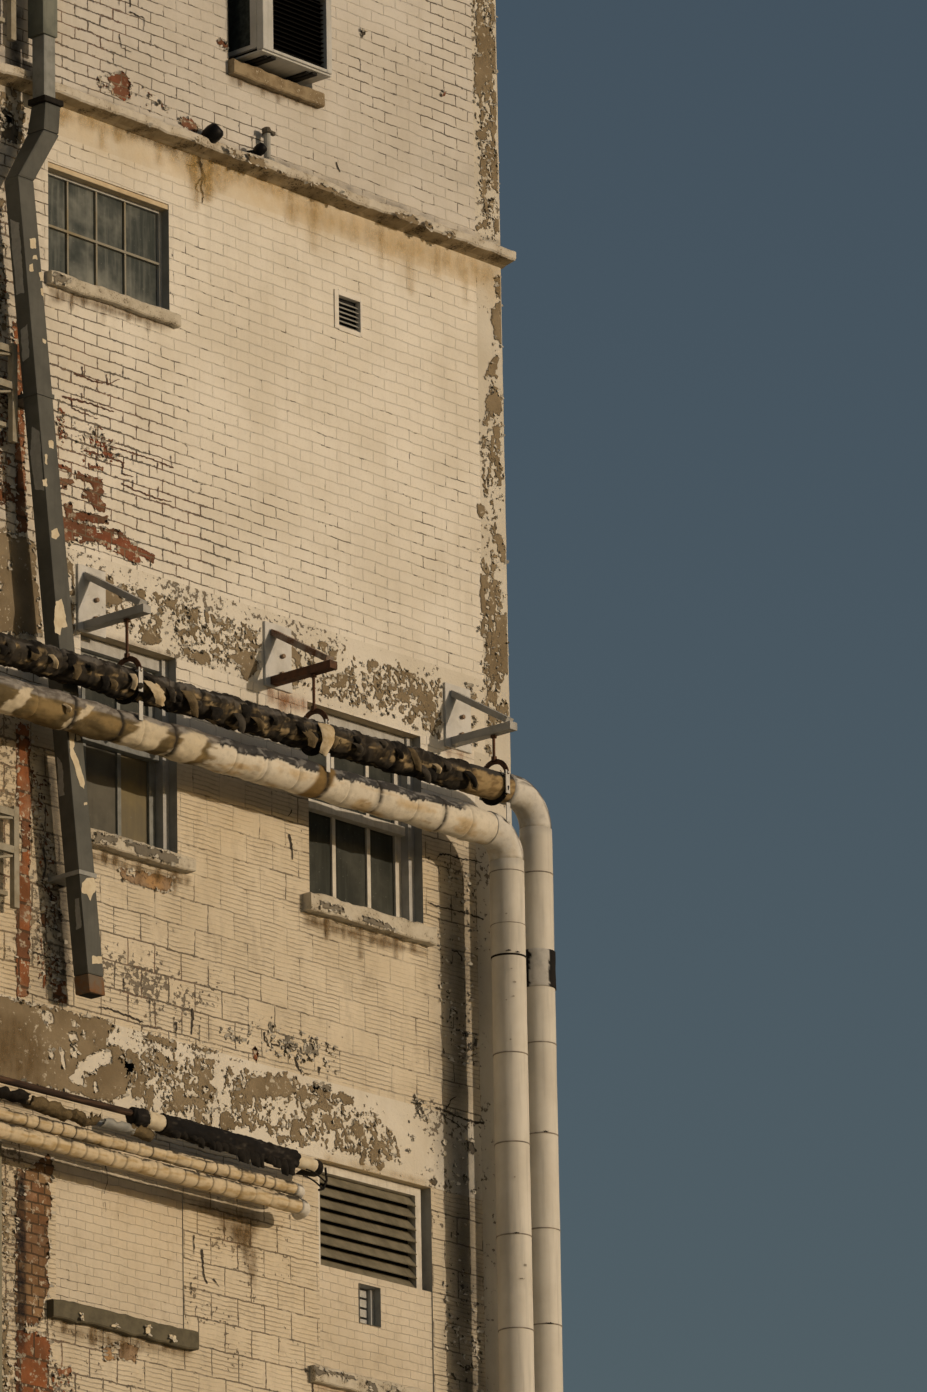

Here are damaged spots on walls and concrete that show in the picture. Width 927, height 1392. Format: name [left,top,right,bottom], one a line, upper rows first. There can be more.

flaking render [97,70,201,145]
peeling [395,0,500,244]
peeling [0,190,262,681]
peeling [465,275,509,756]
peeling [292,641,444,740]
peeling [0,722,481,1194]
flaking render [2,1154,75,1392]